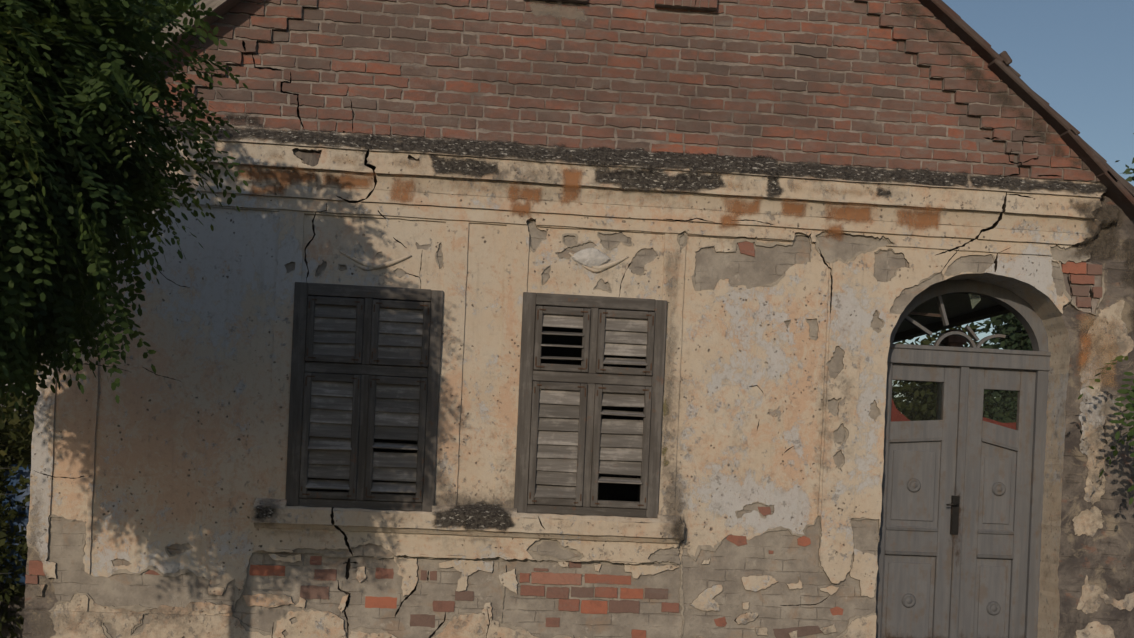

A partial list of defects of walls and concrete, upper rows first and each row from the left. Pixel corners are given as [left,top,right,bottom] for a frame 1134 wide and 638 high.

crack [242,41,304,128]
crack [304,102,422,289]
crack [936,136,1062,273]
flaking render [677,231,909,291]
flaking render [870,254,995,333]
flaking render [826,346,845,379]
flaking render [828,398,849,471]
flaking render [868,400,881,421]
flaking render [1037,192,1134,638]
crack [330,507,357,638]
flaking render [22,501,880,638]